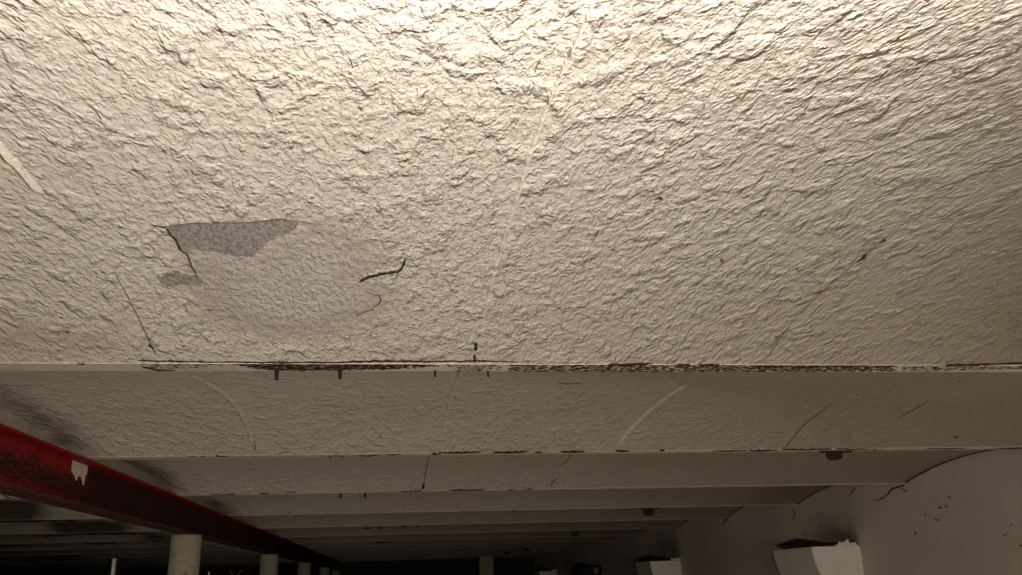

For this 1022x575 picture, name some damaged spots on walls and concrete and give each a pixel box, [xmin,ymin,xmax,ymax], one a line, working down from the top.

crack [114,270,156,355]
peeling [150,218,335,287]
crack [764,202,936,361]
rust [138,360,1022,372]
rust [0,440,335,568]